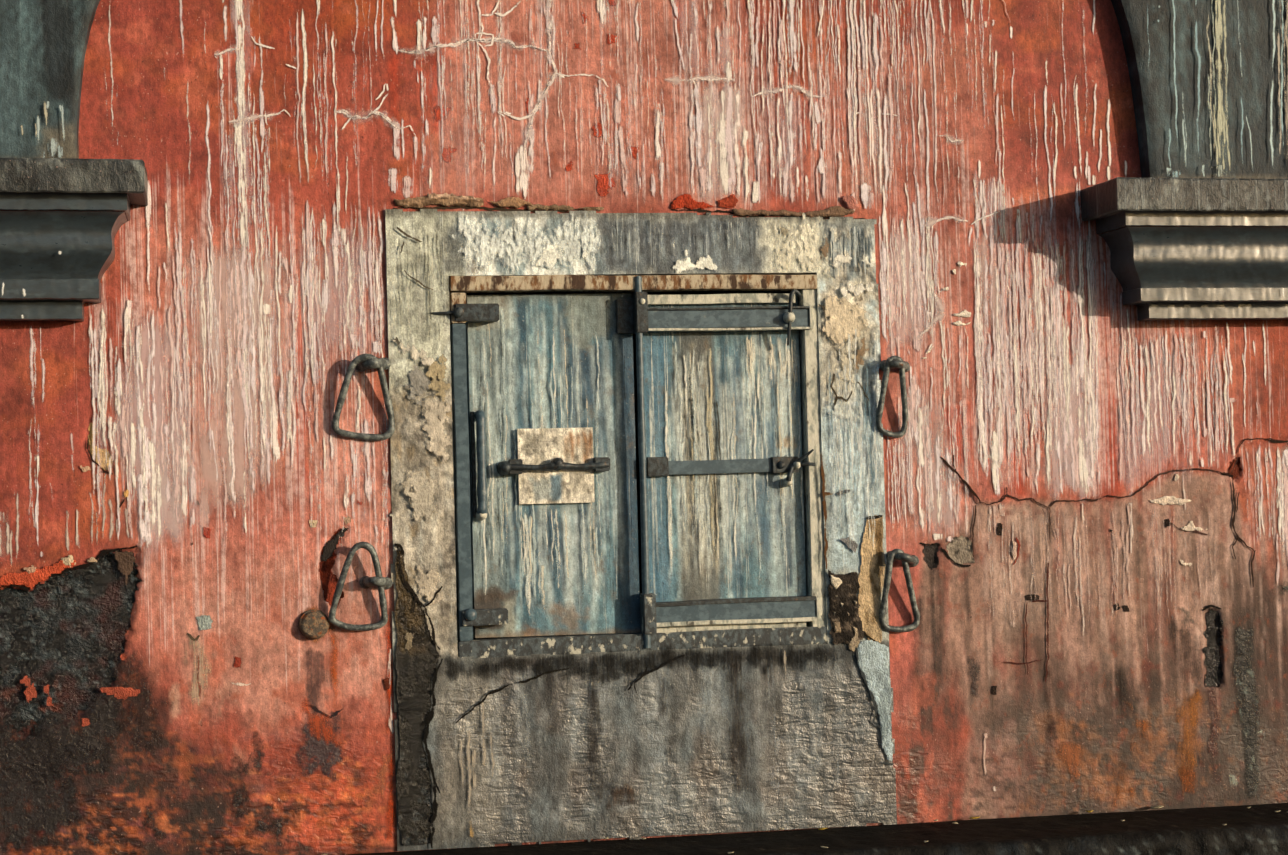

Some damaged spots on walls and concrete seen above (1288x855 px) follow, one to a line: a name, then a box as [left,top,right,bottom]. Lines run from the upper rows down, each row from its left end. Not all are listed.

crack [336,84,416,136]
crack [398,0,608,153]
peeling [393,337,452,462]
flaking render [0,545,172,786]
corrosion [304,701,337,745]
corrosion [383,622,394,734]
peeling [401,470,437,521]
crack [397,546,569,848]
water stain [447,643,838,808]
peeling [828,515,894,761]
crack [940,438,1288,682]
water stain [1230,626,1262,799]